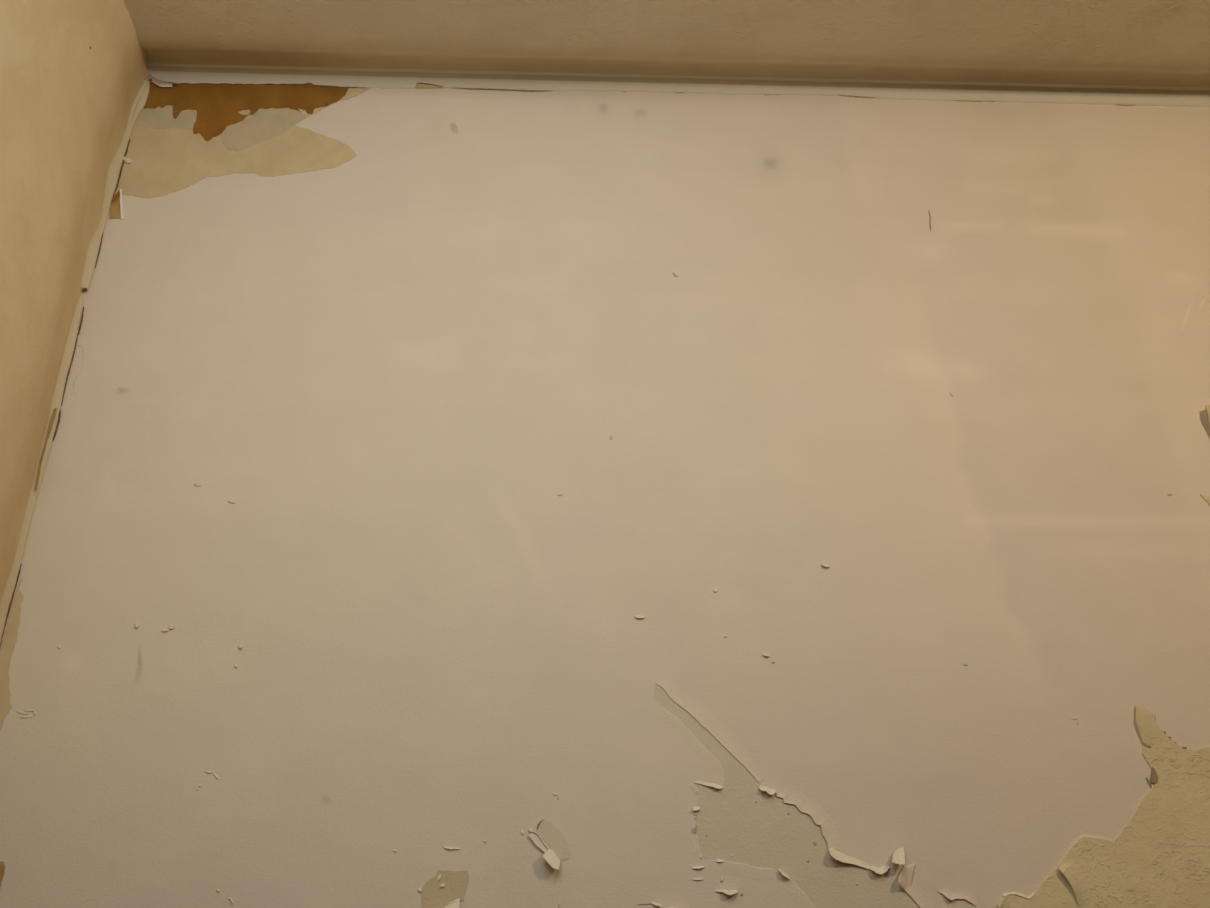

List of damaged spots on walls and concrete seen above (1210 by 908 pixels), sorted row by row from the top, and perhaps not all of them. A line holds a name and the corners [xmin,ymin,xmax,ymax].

peeling [114,73,370,198]
peeling [0,587,24,730]
peeling [1135,704,1156,748]
peeling [528,819,571,870]
peeling [417,870,469,908]
peeling [1059,858,1094,905]